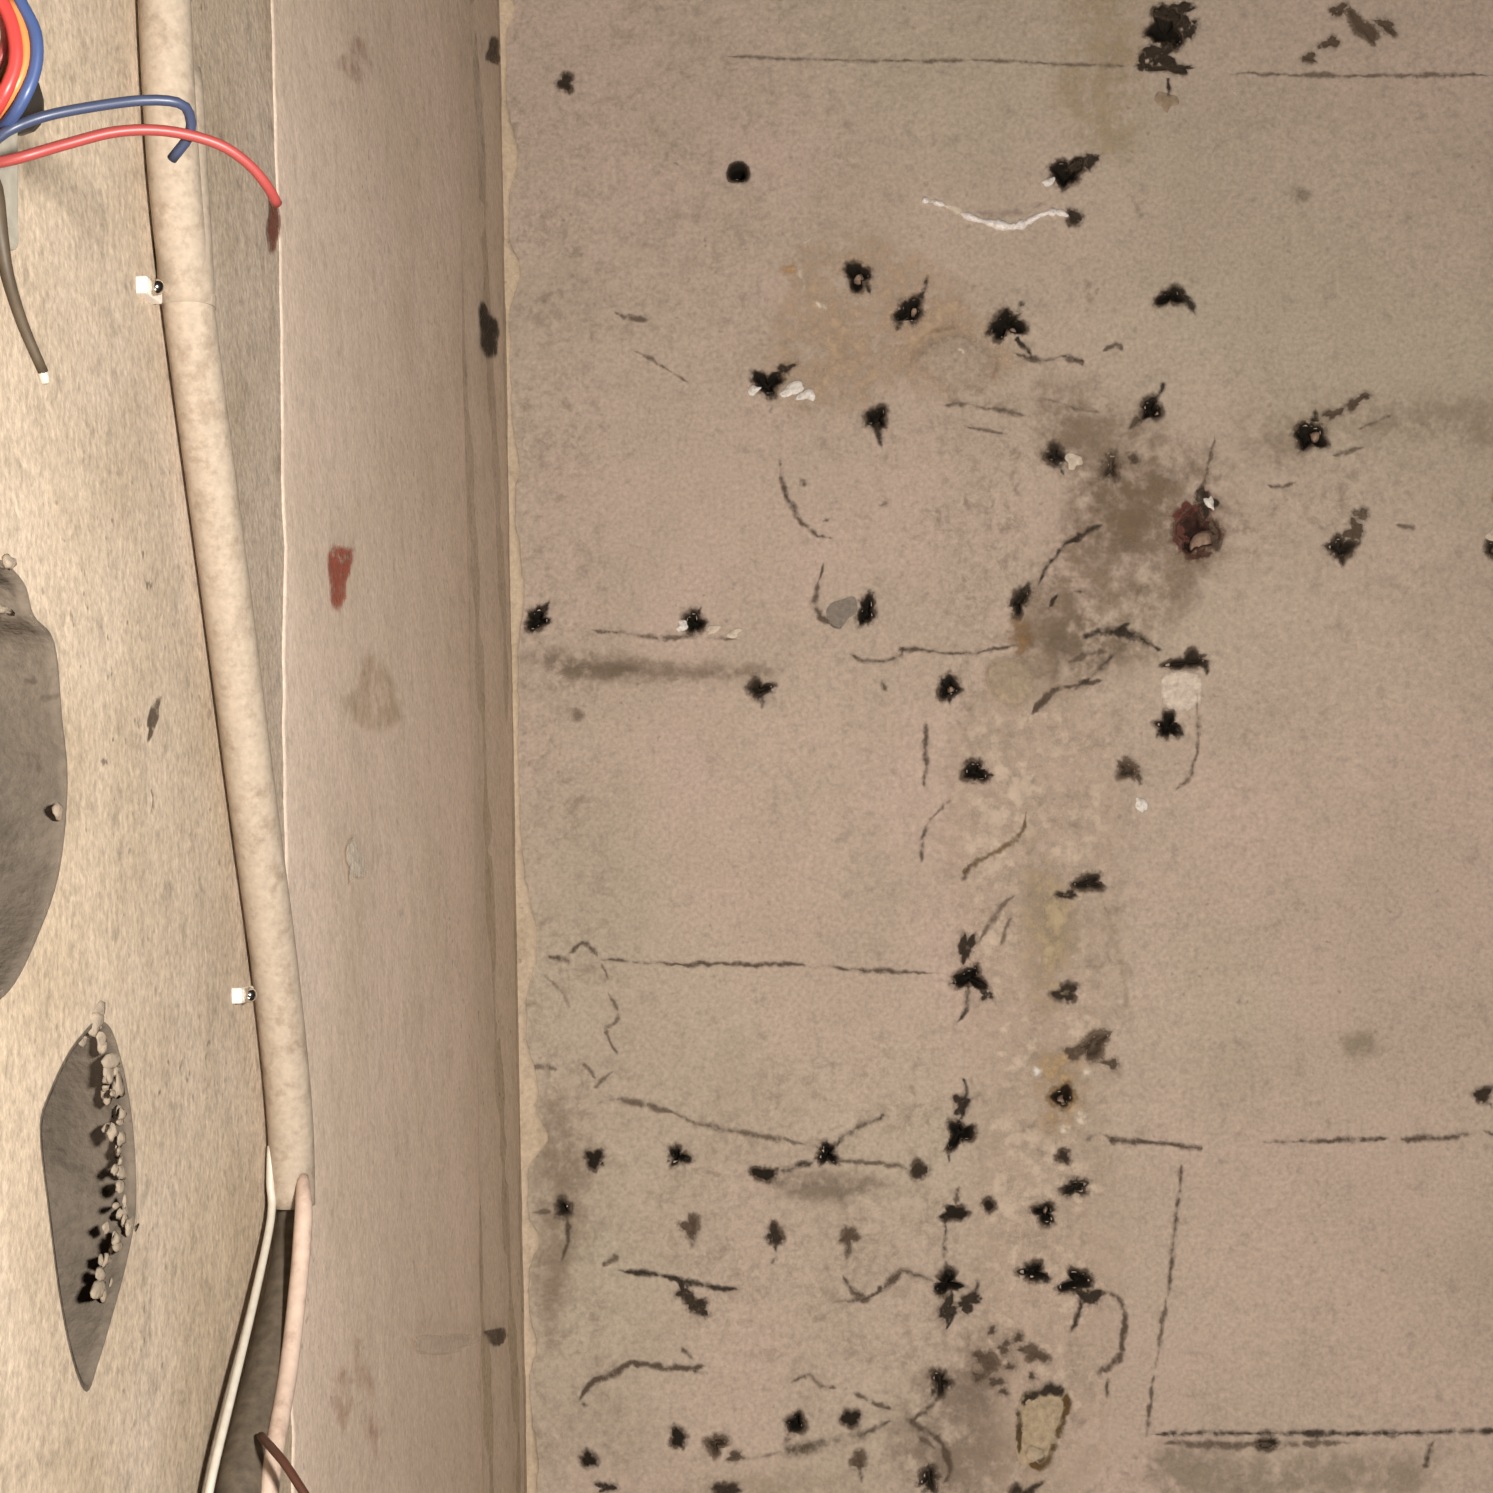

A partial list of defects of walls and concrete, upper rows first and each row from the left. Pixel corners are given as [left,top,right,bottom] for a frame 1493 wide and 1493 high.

water stain [922,197,1069,231]
crack [780,464,829,623]
crack [1039,525,1101,607]
crack [1032,623,1160,714]
spalling [0,554,68,999]
crack [534,942,926,1170]
spalling [40,1000,140,1392]
crack [603,1254,737,1292]
crack [580,1349,703,1405]
spalling [929,1368,954,1398]
flaking render [972,1326,1072,1493]
crack [1099,1292,1128,1396]